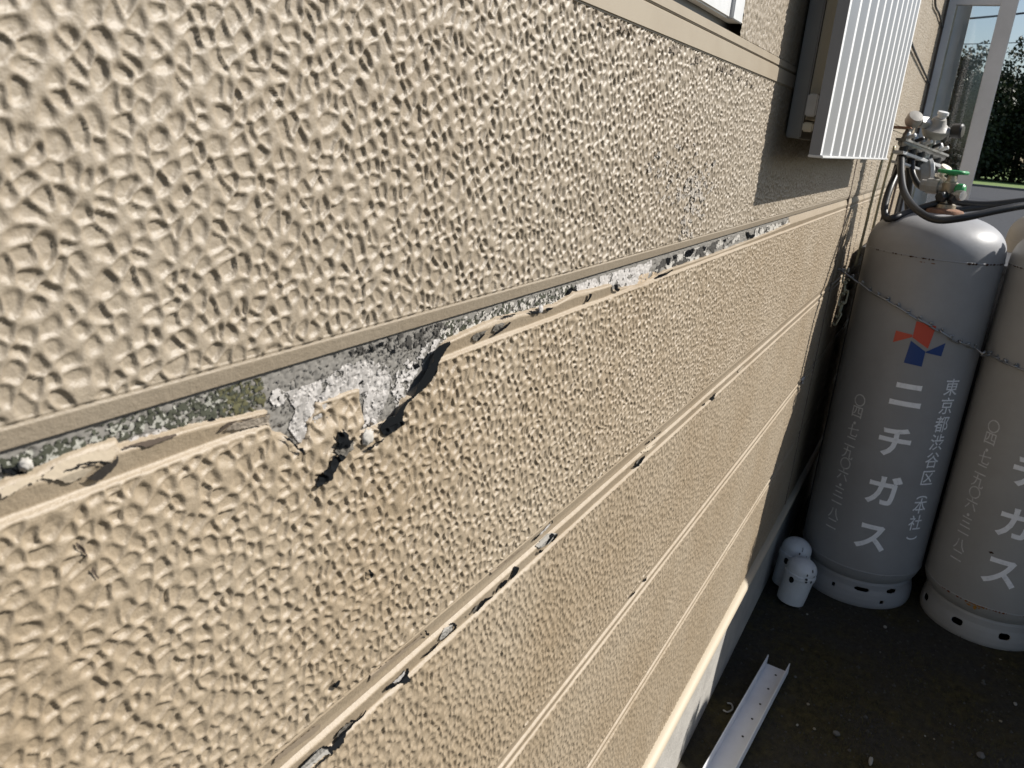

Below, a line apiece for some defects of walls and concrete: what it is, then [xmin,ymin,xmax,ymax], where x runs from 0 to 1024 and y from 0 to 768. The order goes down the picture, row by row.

spalling [0,216,789,499]
water stain [130,427,167,442]
spalling [301,747,330,768]